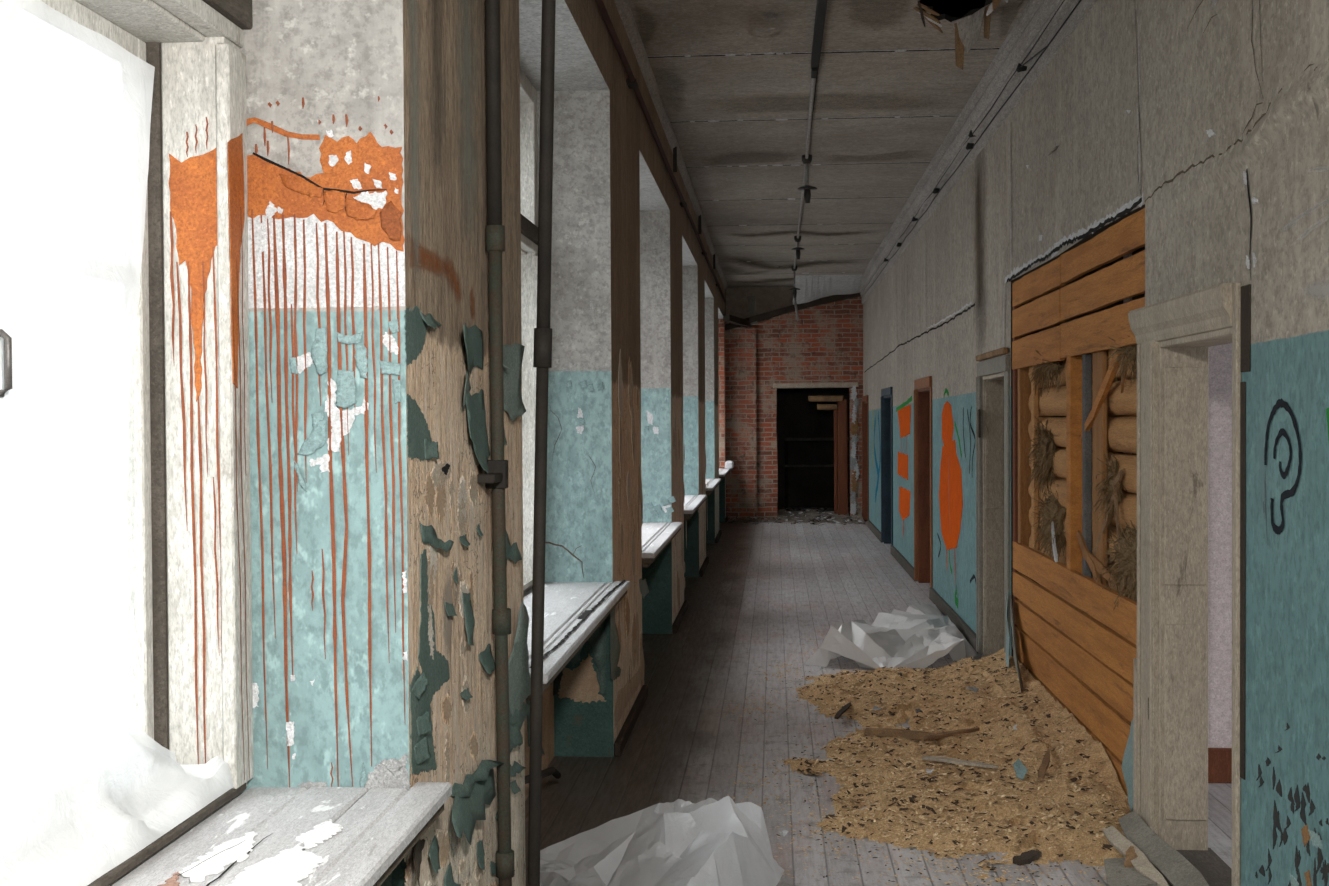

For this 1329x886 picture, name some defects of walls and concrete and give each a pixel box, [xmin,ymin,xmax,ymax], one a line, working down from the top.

peeling [256,201,283,254]
crack [253,152,387,211]
peeling [280,150,401,241]
crack [1135,0,1329,278]
peeling [550,349,708,703]
peeling [289,306,545,886]
peeling [286,721,296,759]
peeling [157,819,343,886]
peeling [1255,745,1329,886]